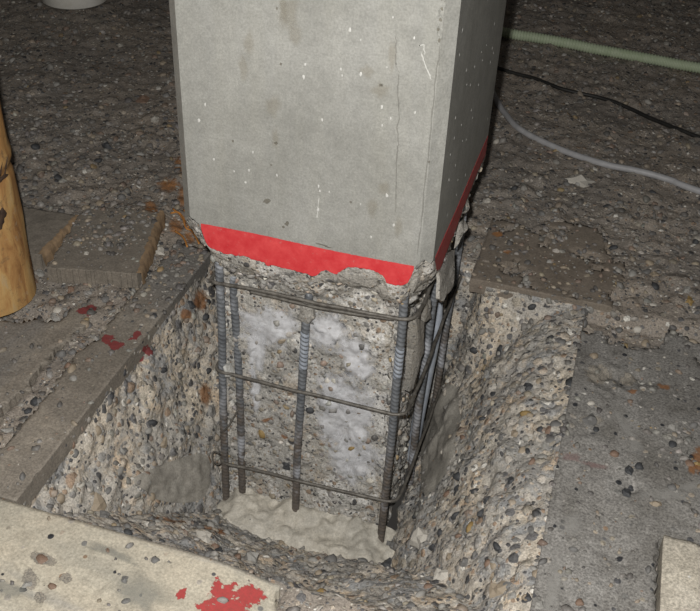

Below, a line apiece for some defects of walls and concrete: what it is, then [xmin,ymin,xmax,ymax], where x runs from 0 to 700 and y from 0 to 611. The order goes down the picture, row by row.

water stain [240,307,298,411]
spalling [28,155,585,611]
water stain [310,315,380,485]
spalling [22,552,56,603]